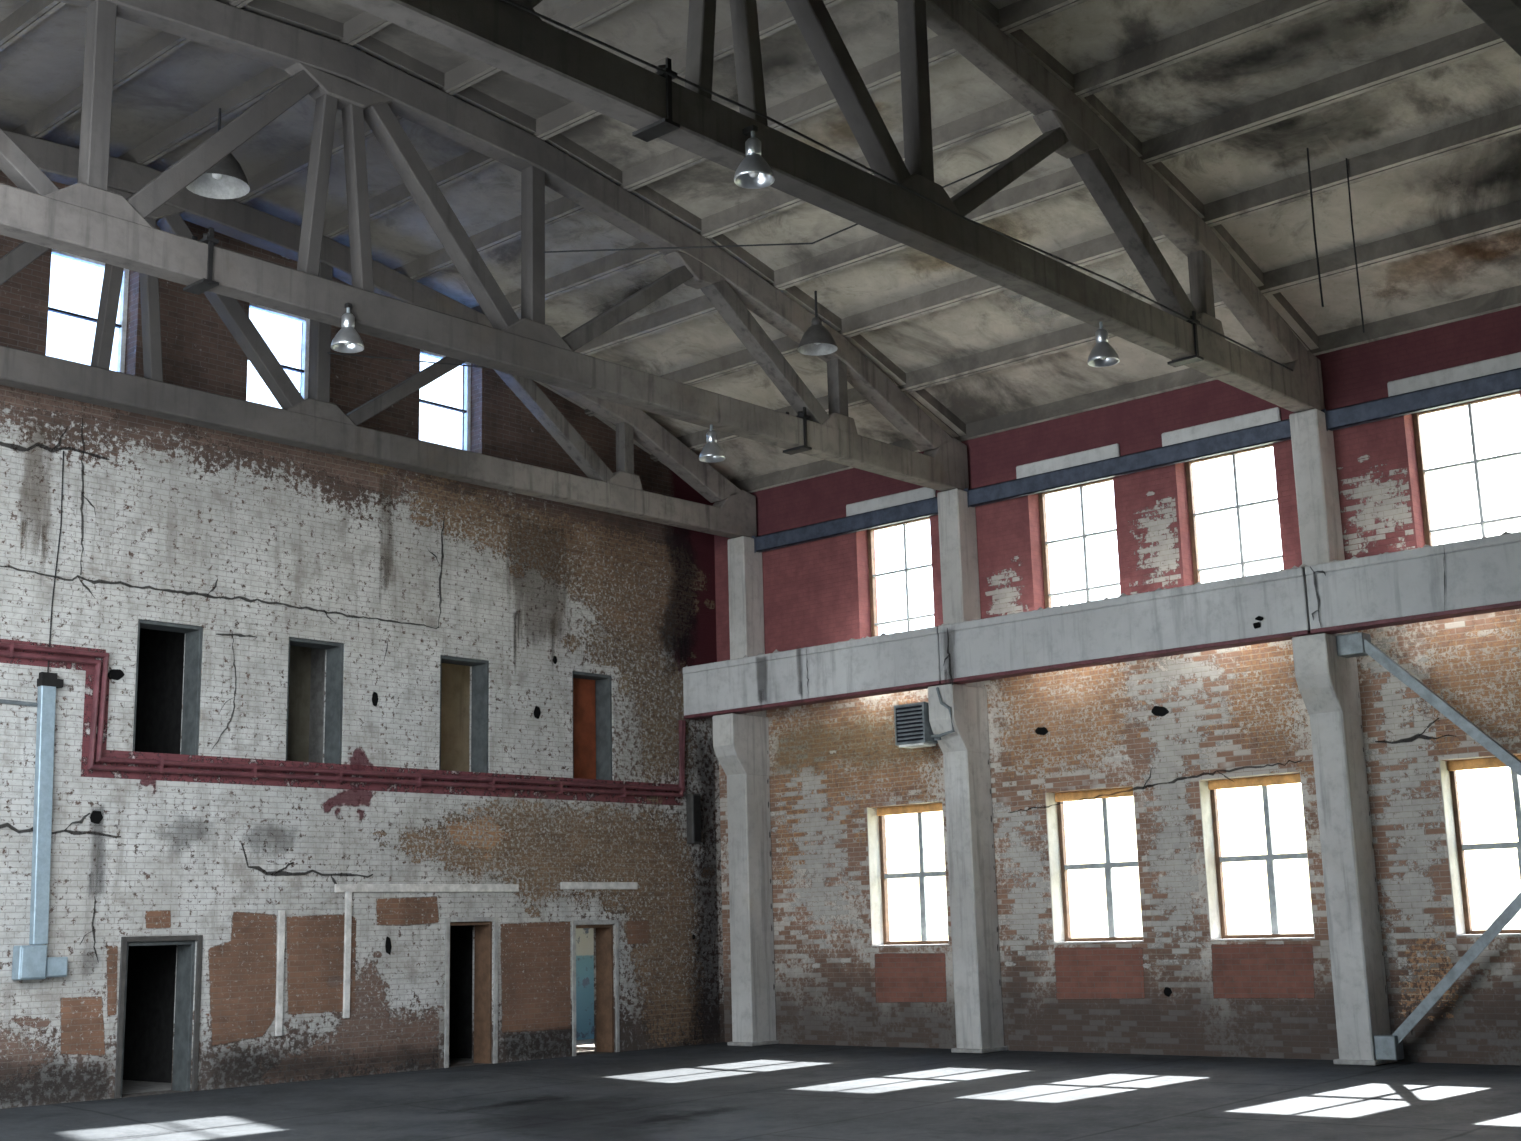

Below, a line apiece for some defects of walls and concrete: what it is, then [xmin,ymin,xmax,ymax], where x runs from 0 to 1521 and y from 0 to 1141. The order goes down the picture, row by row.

crack [0,417,444,751]
peeling [1128,492,1181,594]
peeling [1337,455,1415,556]
crack [0,813,121,838]
crack [241,843,373,884]
peeling [369,462,715,1047]
flaking render [0,946,118,1089]
peeling [207,896,439,1085]